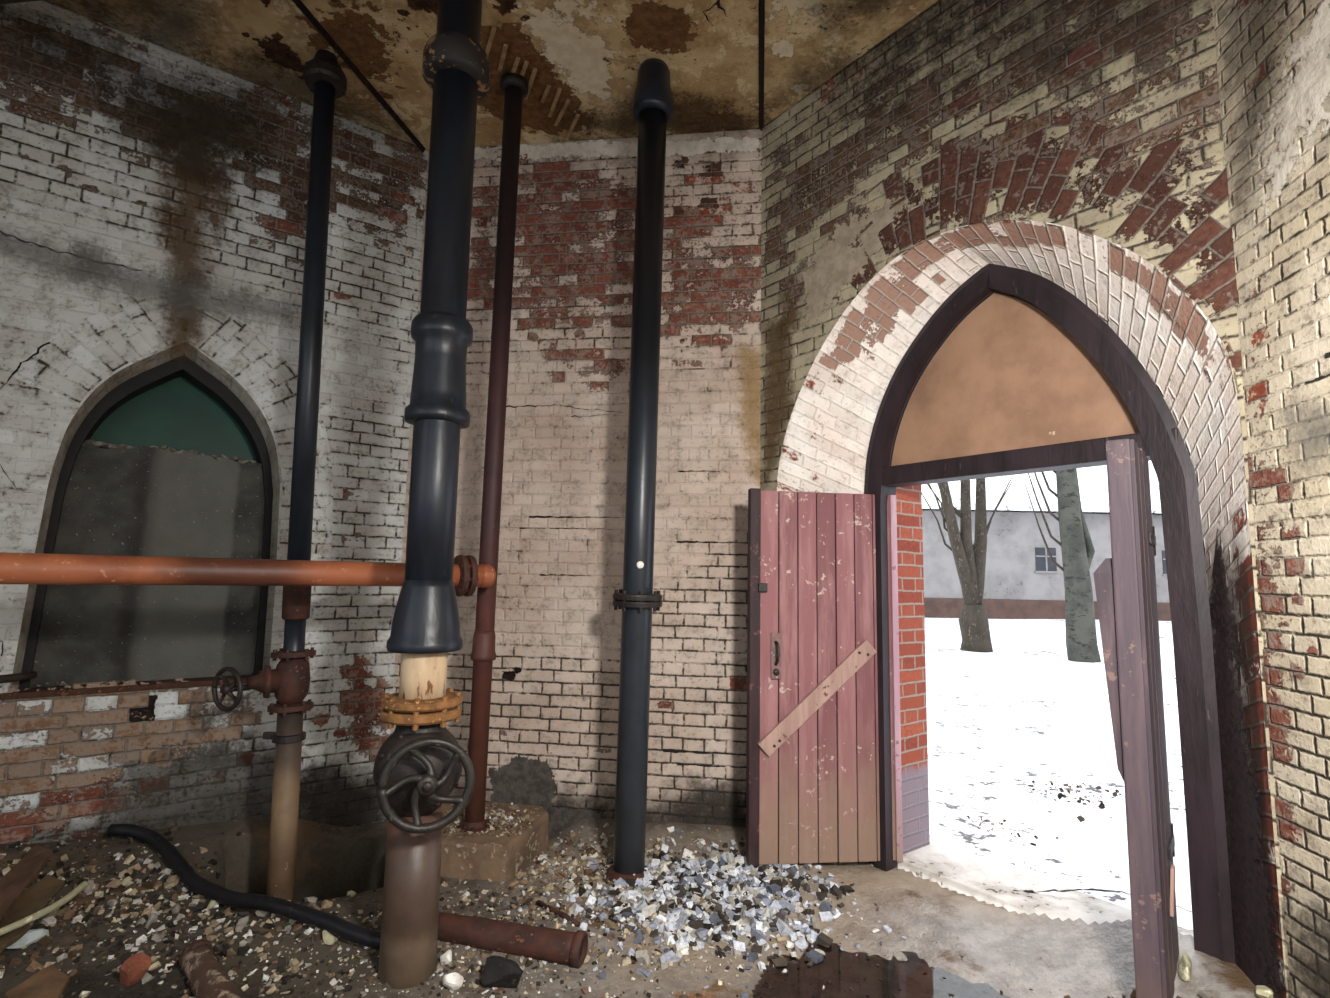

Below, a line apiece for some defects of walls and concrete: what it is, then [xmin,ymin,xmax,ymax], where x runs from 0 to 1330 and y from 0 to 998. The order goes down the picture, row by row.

crack [0,231,143,271]
peeling [0,6,313,268]
damp [105,62,260,355]
peeling [241,0,417,99]
peeling [328,116,427,252]
flaking render [397,0,438,17]
peeling [467,145,502,322]
peeling [477,0,699,393]
crack [702,0,727,26]
peeling [660,0,1243,393]
peeling [0,670,265,845]
flaking render [310,641,390,763]